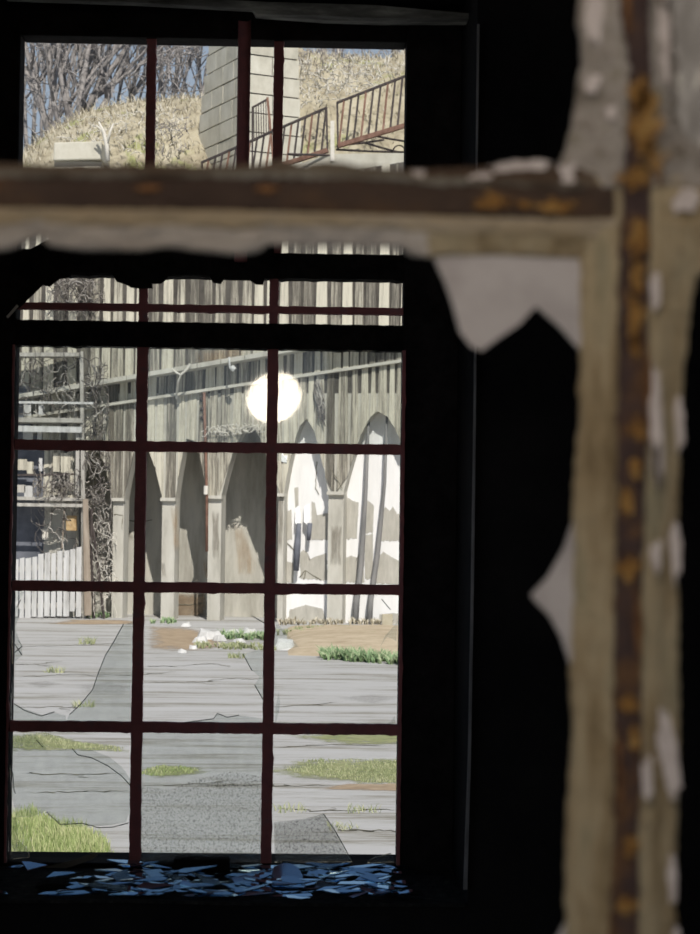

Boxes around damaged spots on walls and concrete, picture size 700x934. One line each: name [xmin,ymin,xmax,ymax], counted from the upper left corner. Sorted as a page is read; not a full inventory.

peeling [585,0,605,46]
peeling [657,0,671,86]
peeling [583,73,602,94]
corrosion [474,191,578,213]
peeling [672,187,700,214]
corrosion [624,216,652,444]
crack [13,624,128,716]
crack [147,654,332,723]
crack [10,748,130,828]
crack [163,779,235,787]
crack [281,808,396,861]